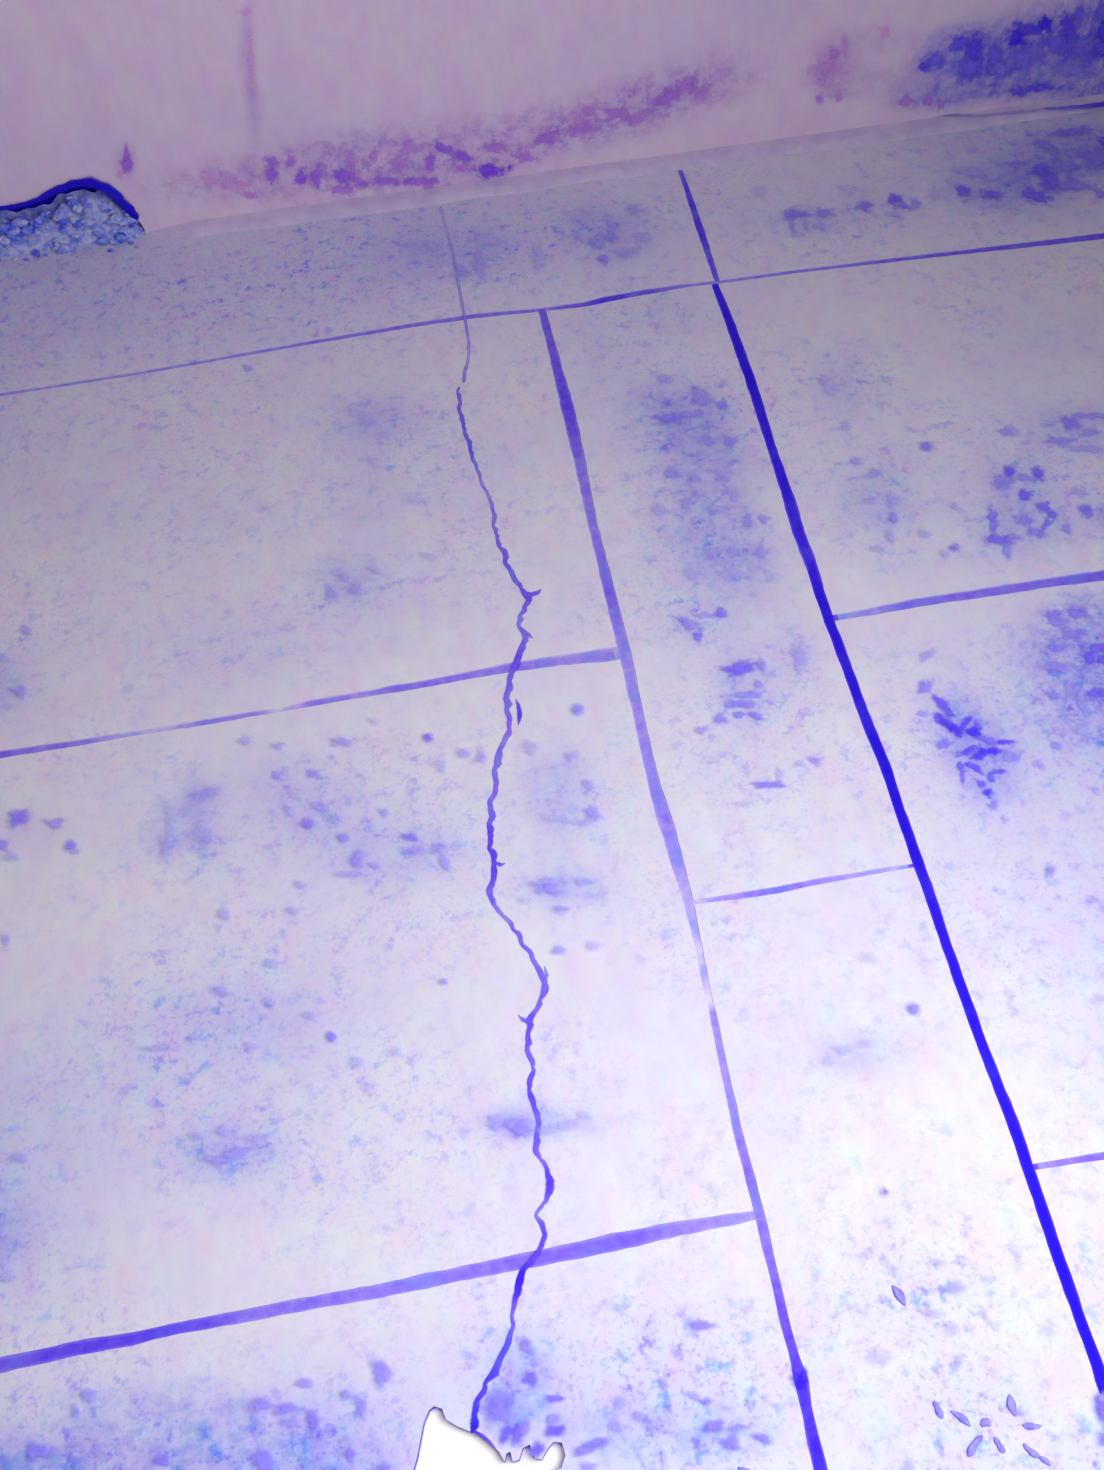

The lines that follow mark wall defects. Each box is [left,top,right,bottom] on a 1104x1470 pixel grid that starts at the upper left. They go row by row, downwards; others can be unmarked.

leakage [900,0,1104,108]
leakage [267,77,709,193]
spalling [0,177,146,262]
crack [440,206,554,1450]